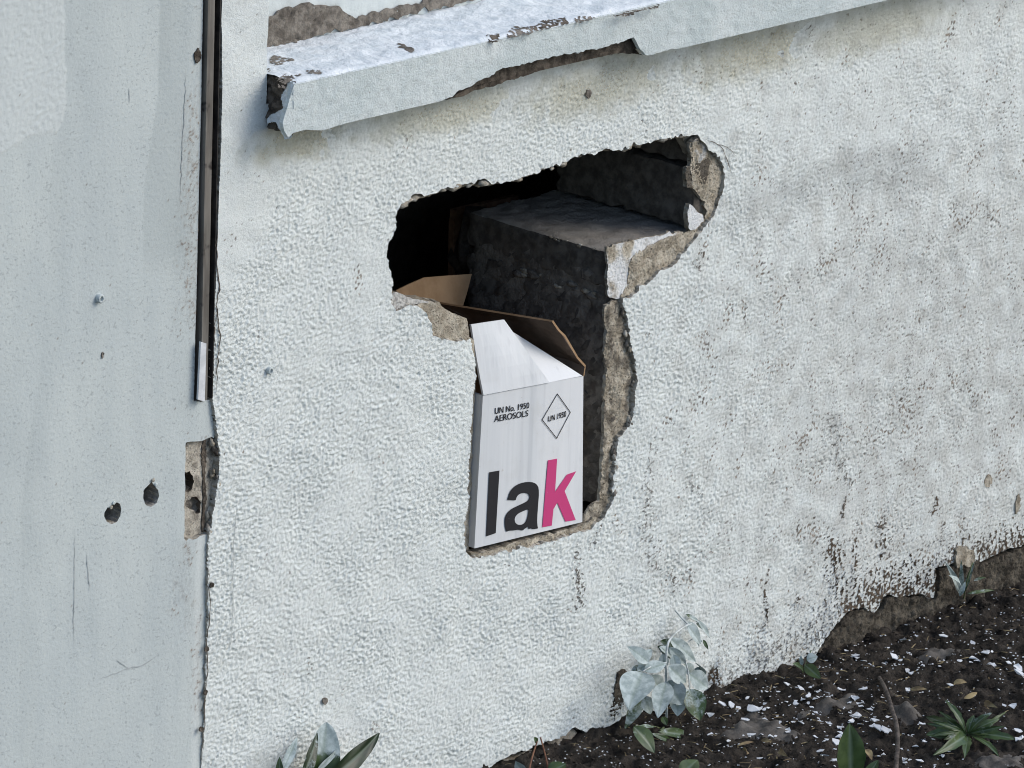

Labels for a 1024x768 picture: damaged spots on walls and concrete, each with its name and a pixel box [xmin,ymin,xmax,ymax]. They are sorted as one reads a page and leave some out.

peeling [265,0,474,139]
spalling [446,70,538,100]
peeling [486,16,595,43]
spalling [399,179,490,209]
flaking render [391,290,469,340]
flaking render [466,134,722,557]
spalling [184,437,225,538]
damp [639,443,681,596]
damp [810,536,859,647]
peeling [818,545,1024,653]